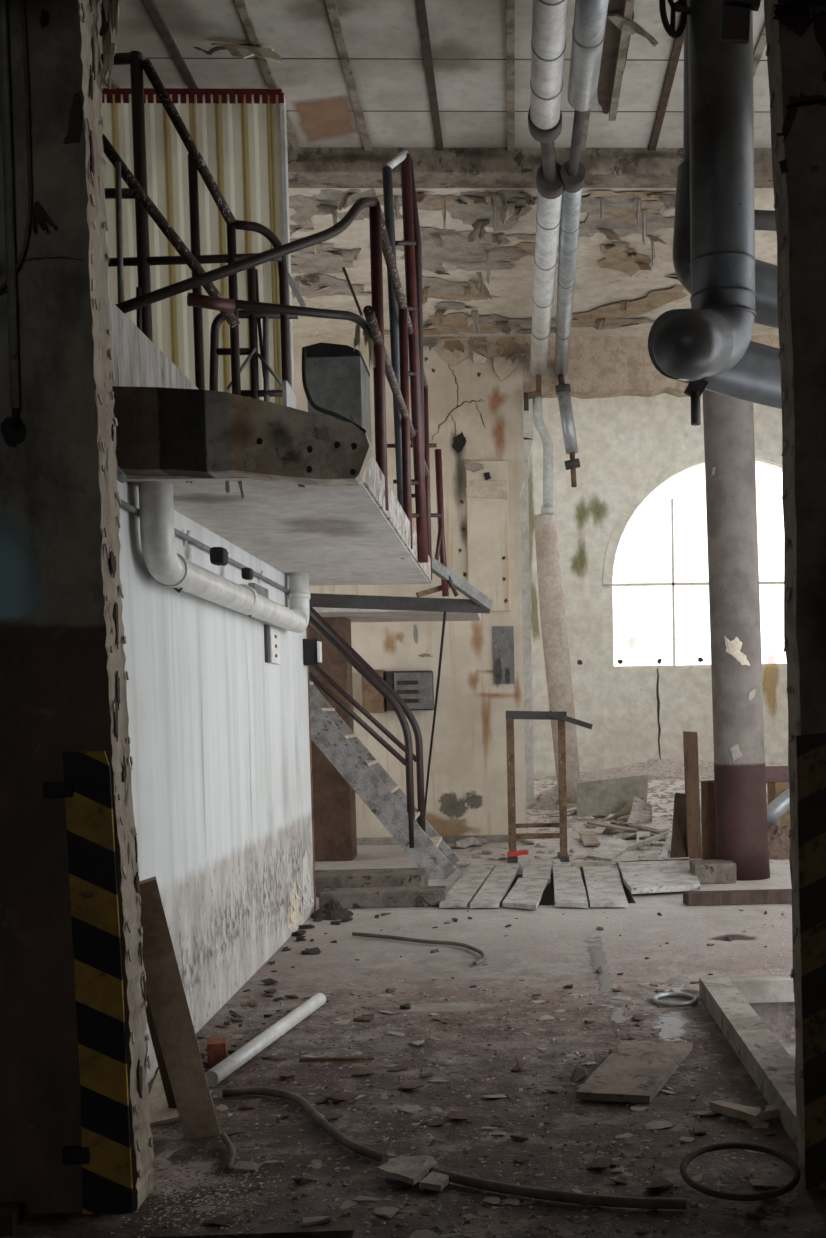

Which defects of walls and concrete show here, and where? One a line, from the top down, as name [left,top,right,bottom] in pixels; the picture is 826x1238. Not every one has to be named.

peeling [63,0,121,231]
peeling [289,188,537,381]
peeling [571,190,687,330]
crack [432,368,486,440]
peeling [104,492,126,653]
peeling [724,636,750,666]
peeling [113,671,133,800]
peeling [729,744,743,762]
peeling [120,817,141,905]
peeling [134,1056,153,1151]